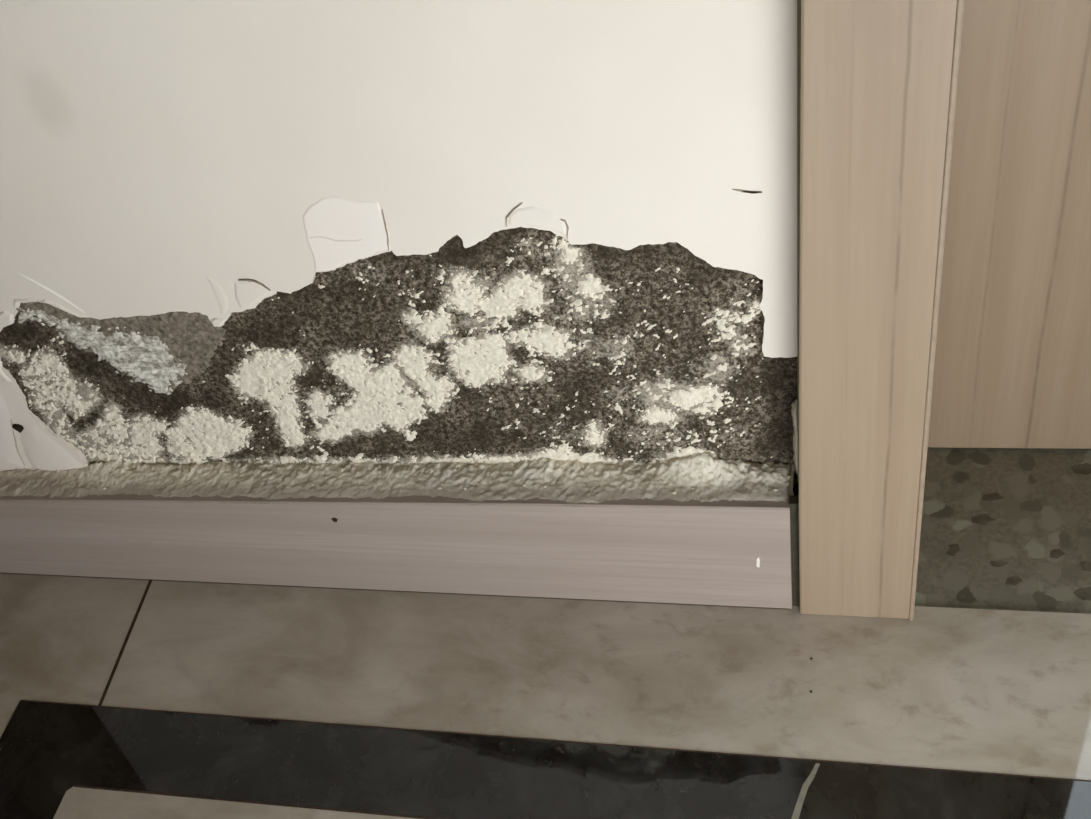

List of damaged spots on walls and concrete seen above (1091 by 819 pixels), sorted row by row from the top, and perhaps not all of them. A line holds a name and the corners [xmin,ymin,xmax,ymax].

crack [732,187,762,195]
spalling [0,196,799,487]